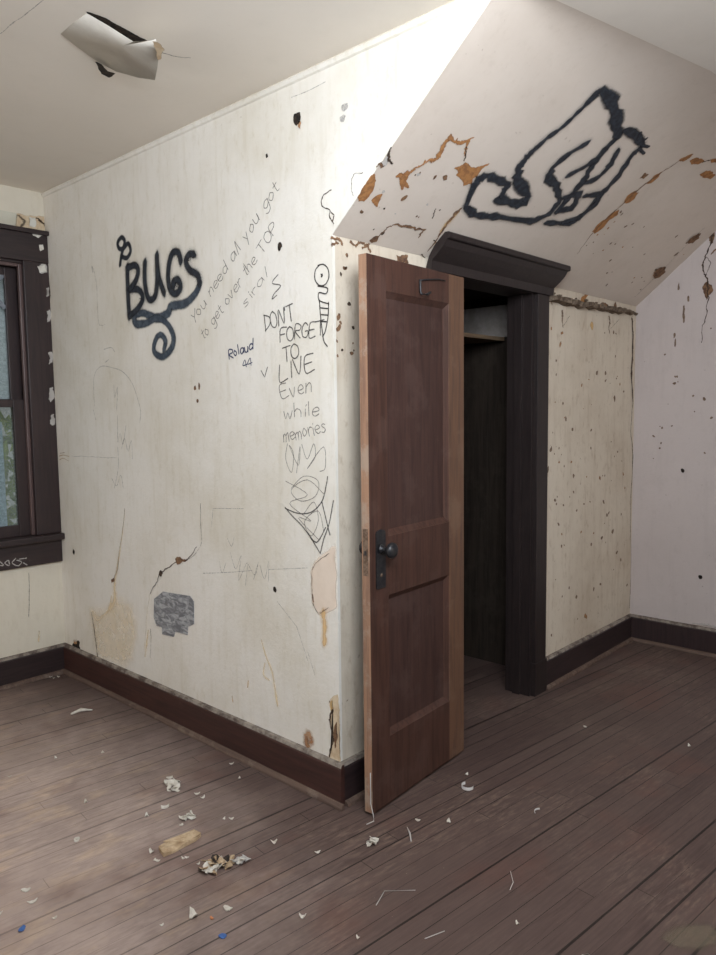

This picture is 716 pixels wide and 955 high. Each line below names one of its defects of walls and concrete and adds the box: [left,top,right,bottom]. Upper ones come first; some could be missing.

peeling [61,12,189,80]
peeling [357,134,490,214]
peeling [690,158,716,179]
crack [637,229,716,343]
crack [144,504,202,655]
peeling [311,546,337,645]
flaking render [329,694,341,762]